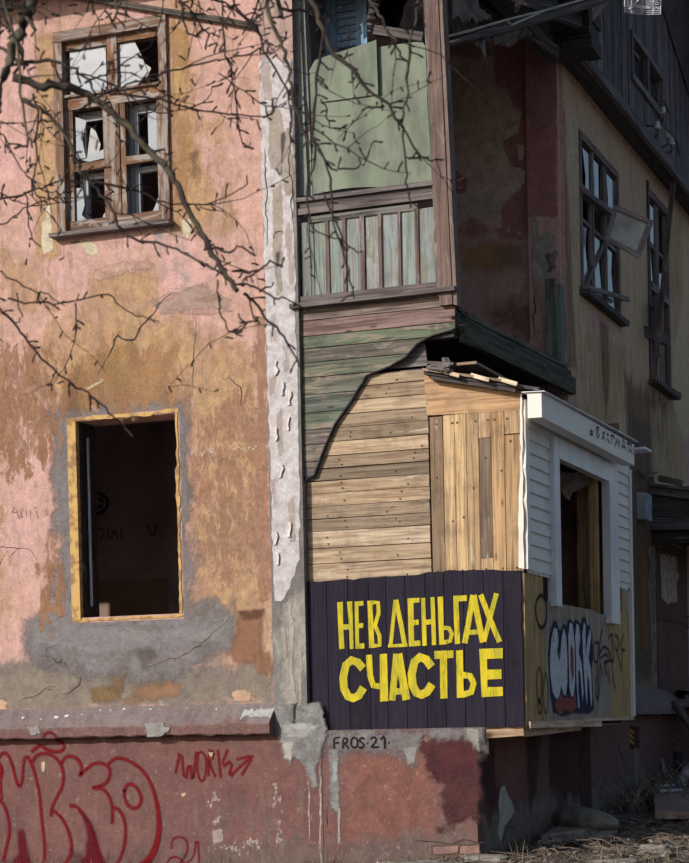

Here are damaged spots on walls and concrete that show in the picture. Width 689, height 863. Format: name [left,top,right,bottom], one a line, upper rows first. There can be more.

peeling [450,55,526,230]
peeling [230,55,300,678]
peeling [0,332,72,490]
peeling [35,556,66,637]
crack [22,644,81,699]
crack [140,620,228,669]
peeling [232,690,251,701]